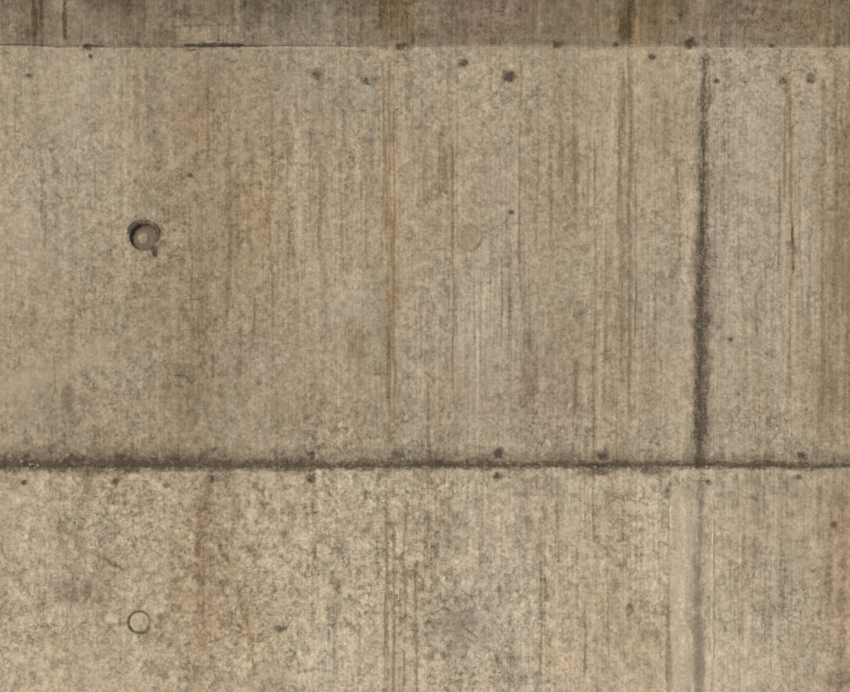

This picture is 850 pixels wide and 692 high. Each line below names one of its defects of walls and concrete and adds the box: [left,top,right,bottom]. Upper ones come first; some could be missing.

water stain [0,211,711,471]
water stain [724,461,850,470]
corrosion [384,596,404,681]